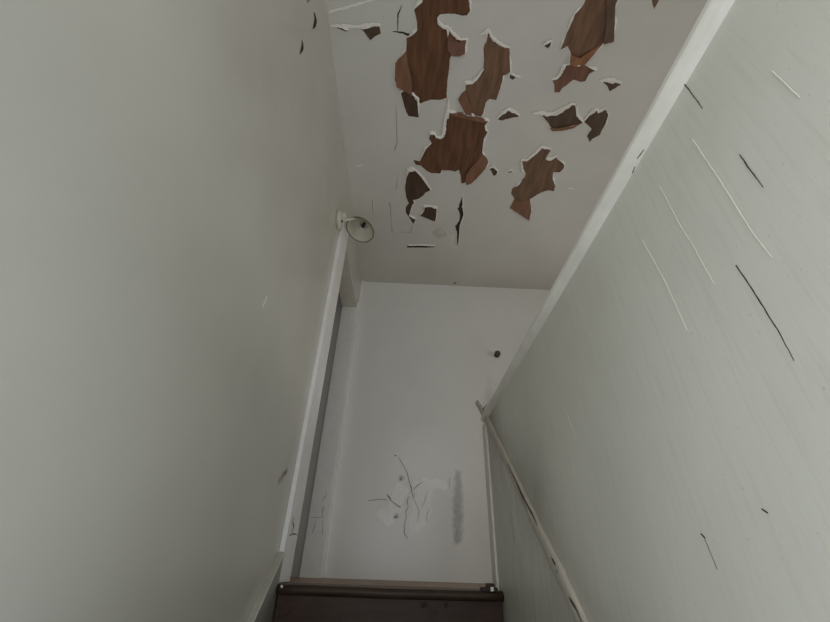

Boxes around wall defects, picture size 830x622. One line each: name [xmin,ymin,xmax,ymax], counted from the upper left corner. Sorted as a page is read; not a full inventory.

peeling [330,22,381,40]
crack [393,5,409,36]
peeling [543,0,623,92]
peeling [393,0,565,223]
peeling [533,102,609,142]
crack [368,455,429,538]